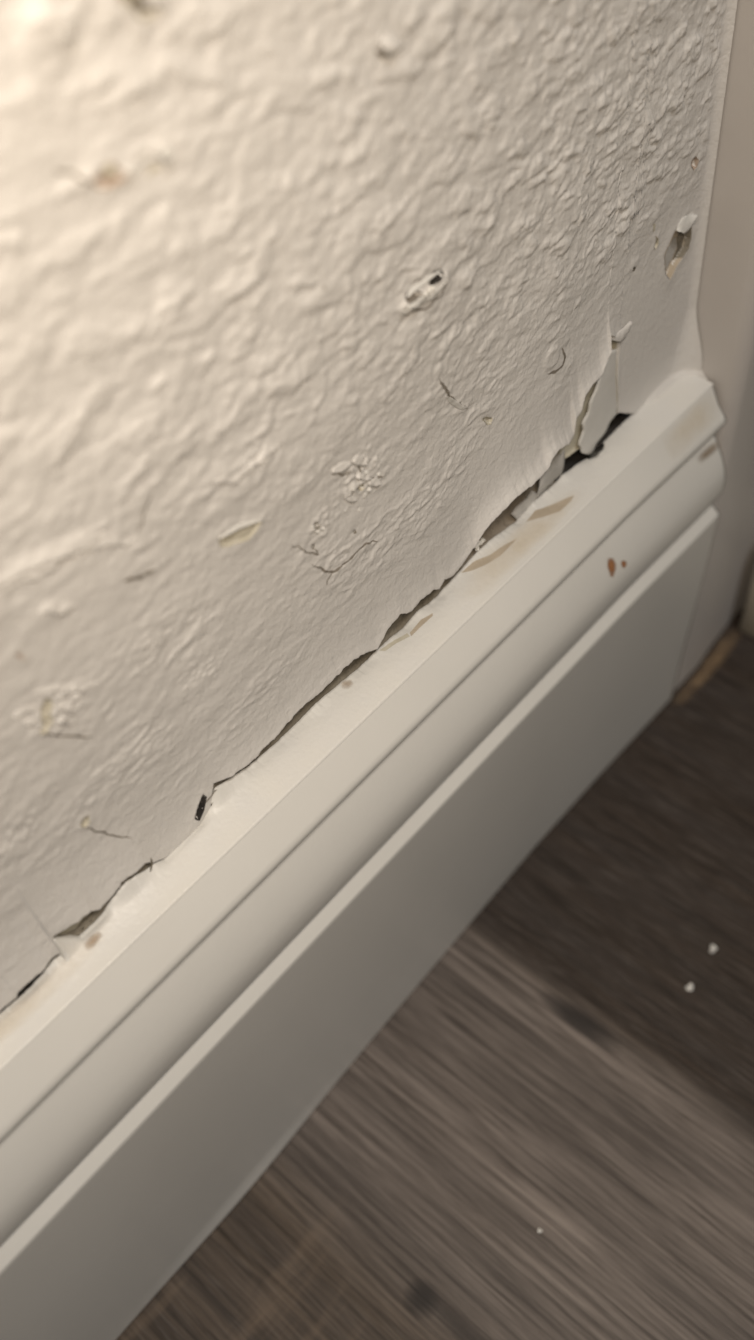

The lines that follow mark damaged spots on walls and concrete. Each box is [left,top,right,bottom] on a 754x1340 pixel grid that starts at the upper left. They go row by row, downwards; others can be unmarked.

spalling [673,214,698,259]
peeling [400,269,450,316]
spalling [331,454,384,512]
peeling [526,496,574,522]
crack [123,569,156,582]
peeling [218,520,263,547]
crack [195,321,633,821]
peeling [461,539,516,573]
peeling [379,613,433,651]
crack [43,827,160,973]